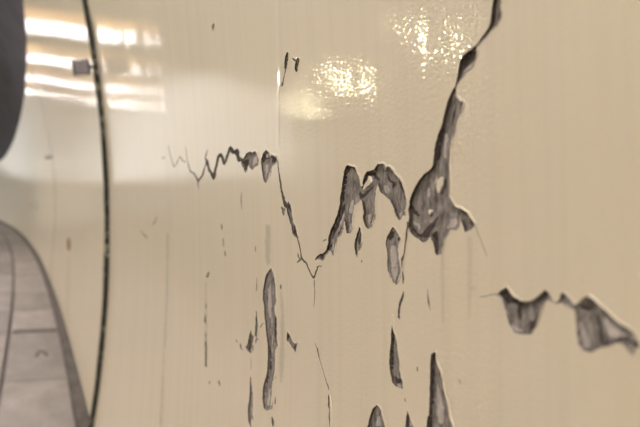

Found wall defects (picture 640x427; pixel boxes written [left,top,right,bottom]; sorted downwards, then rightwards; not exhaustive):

spalling [281,51,301,87]
spalling [315,0,504,285]
crack [162,146,321,303]
spalling [236,267,282,427]
crack [315,344,333,427]
spalling [367,404,387,427]
spalling [389,314,405,389]
spalling [427,351,455,427]
spalling [498,286,640,356]